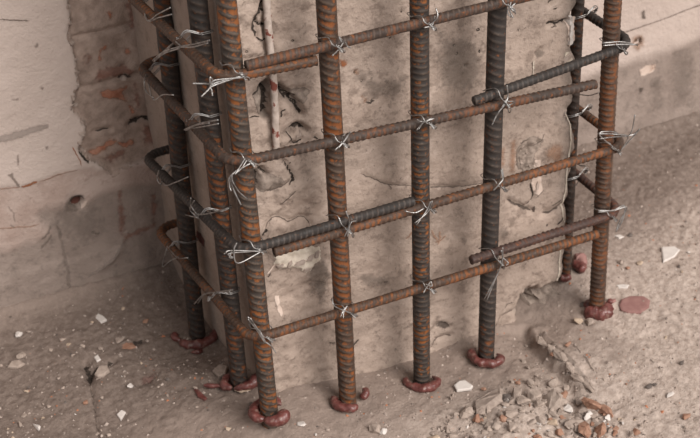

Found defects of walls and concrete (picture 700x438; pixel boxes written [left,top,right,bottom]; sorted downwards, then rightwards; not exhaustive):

crack [252,0,265,42]
spalling [314,49,343,139]
spalling [410,28,430,119]
spalling [476,7,507,91]
spalling [546,0,585,158]
spalling [324,145,347,220]
spalling [411,126,430,203]
spalling [483,110,503,183]
spalling [412,211,430,285]
spalling [481,166,576,312]
spalling [412,290,450,384]
spalling [478,257,498,359]